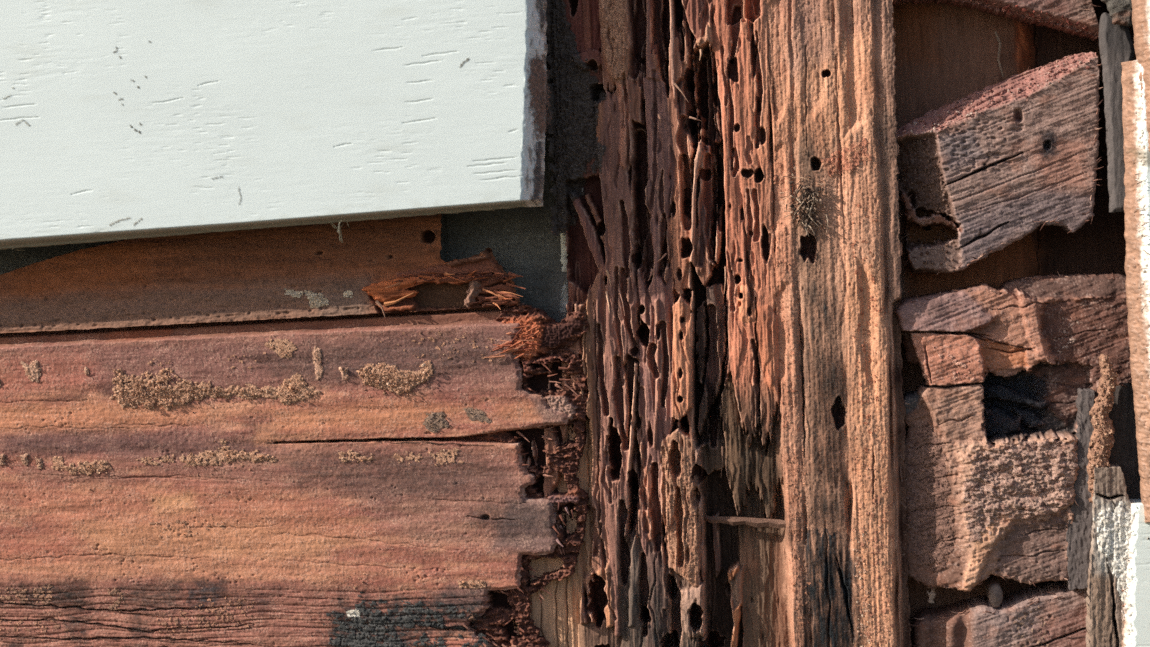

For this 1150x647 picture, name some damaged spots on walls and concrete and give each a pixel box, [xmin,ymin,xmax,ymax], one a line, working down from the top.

peeling [560,232,568,316]
peeling [343,277,419,302]
peeling [464,408,491,423]
crack [267,437,493,446]
damp [322,592,489,647]